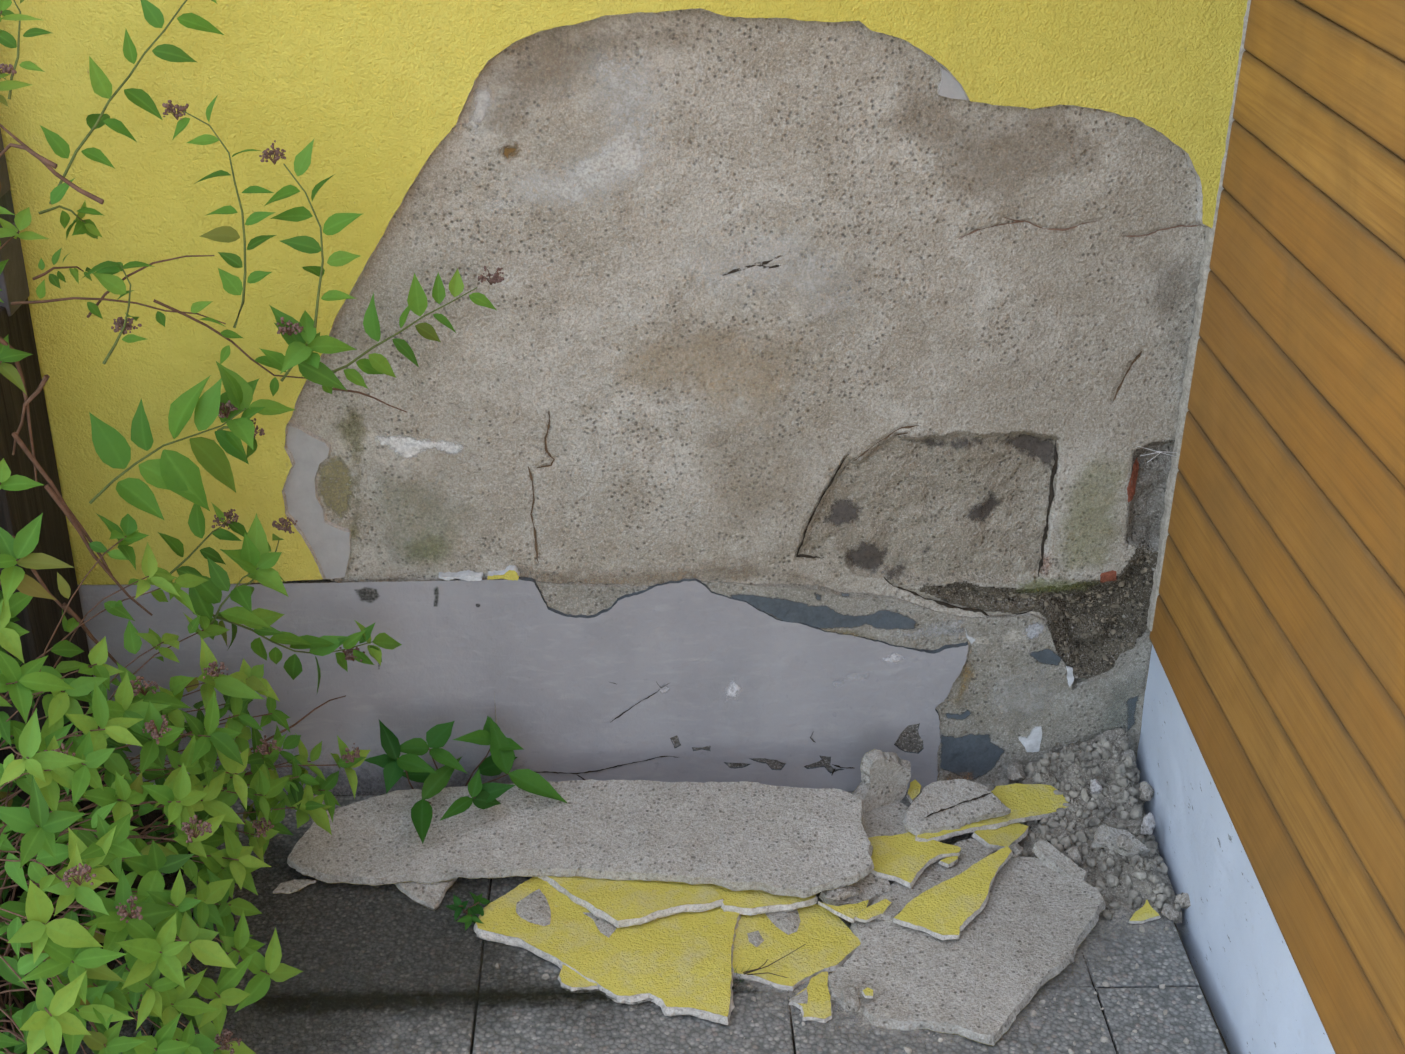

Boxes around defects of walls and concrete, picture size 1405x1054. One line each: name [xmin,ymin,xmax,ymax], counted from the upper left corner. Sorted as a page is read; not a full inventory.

crack [957,217,1096,240]
crack [1126,225,1198,237]
peeling [282,8,1210,787]
crack [528,411,555,563]
crack [796,425,919,559]
crack [1038,441,1058,577]
crack [884,577,1033,617]